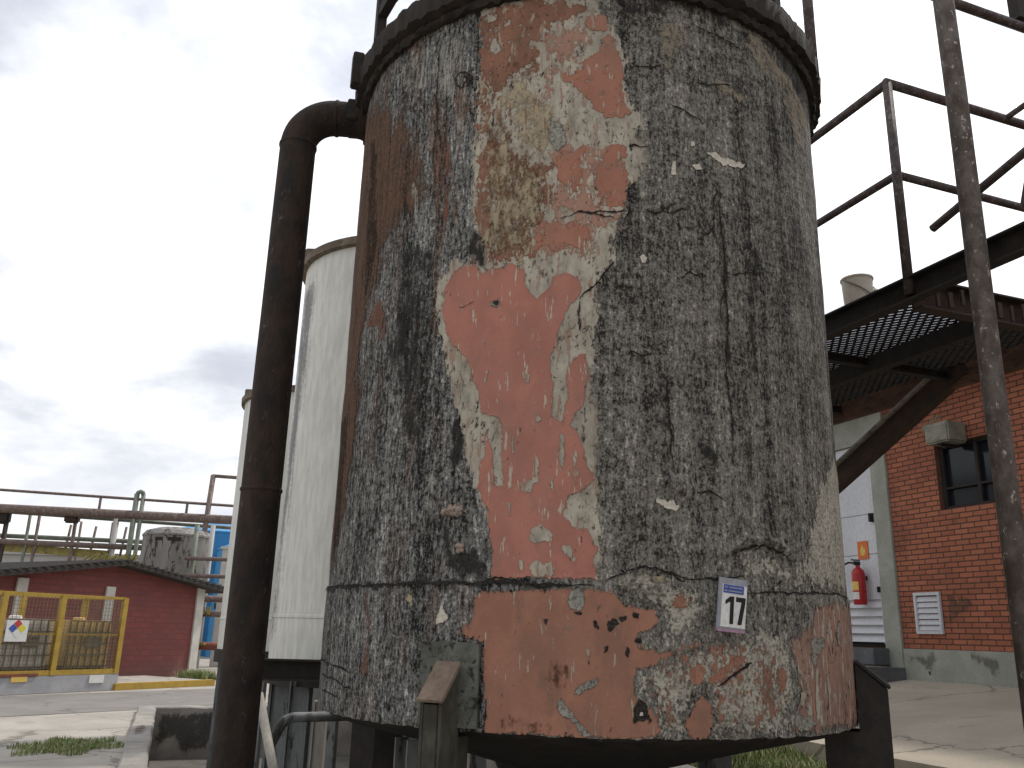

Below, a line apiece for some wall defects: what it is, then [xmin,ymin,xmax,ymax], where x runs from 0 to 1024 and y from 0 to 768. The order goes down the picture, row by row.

peeling [434,0,859,740]
crack [561,190,762,472]
crack [331,544,850,604]